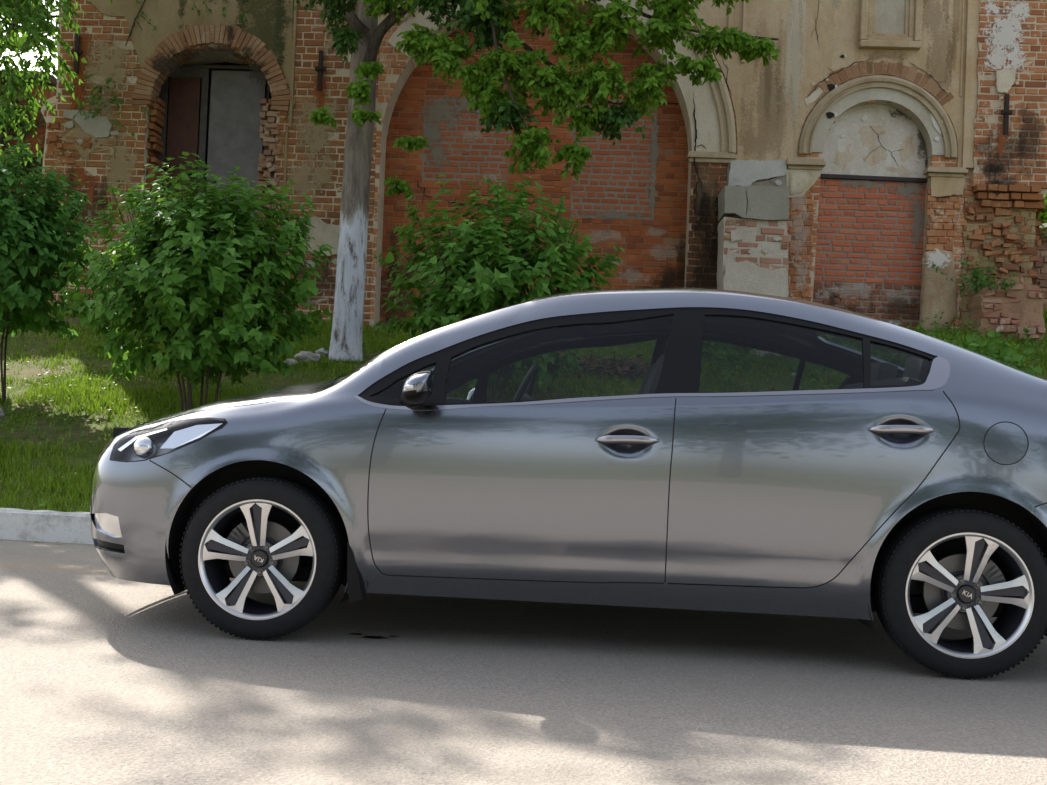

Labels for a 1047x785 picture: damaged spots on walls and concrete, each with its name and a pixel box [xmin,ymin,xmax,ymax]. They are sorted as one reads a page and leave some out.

flaking render [46,109,119,164]
flaking render [728,160,787,186]
damp [978,108,1045,196]
flaking render [723,228,788,297]
spalling [965,206,1028,282]